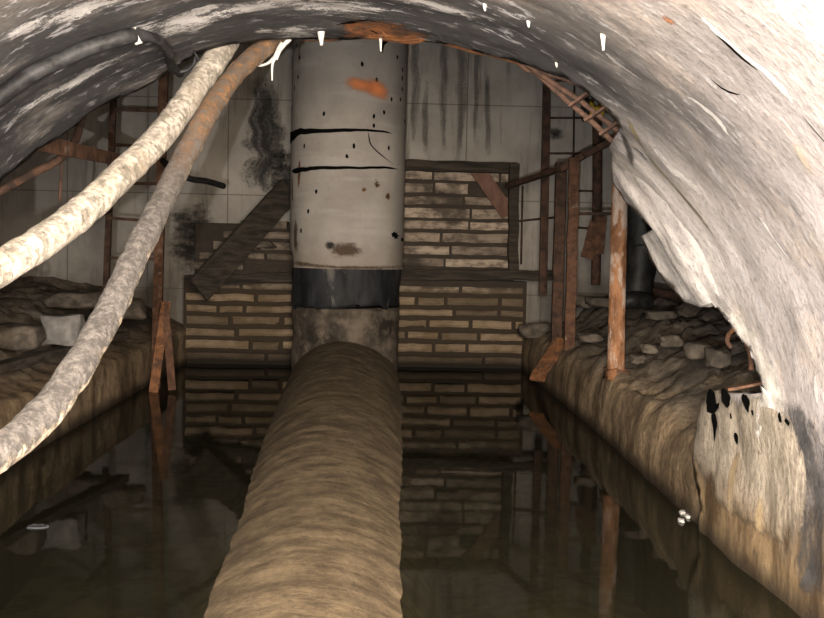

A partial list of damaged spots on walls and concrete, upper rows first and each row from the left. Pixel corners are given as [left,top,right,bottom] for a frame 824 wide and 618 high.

rust [303,20,428,44]
damp [249,26,313,189]
rust [350,79,386,97]
crack [290,128,396,174]
damp [629,122,708,228]
damp [172,204,208,265]
spalling [725,327,736,349]
damp [715,294,824,591]
damp [707,474,718,523]